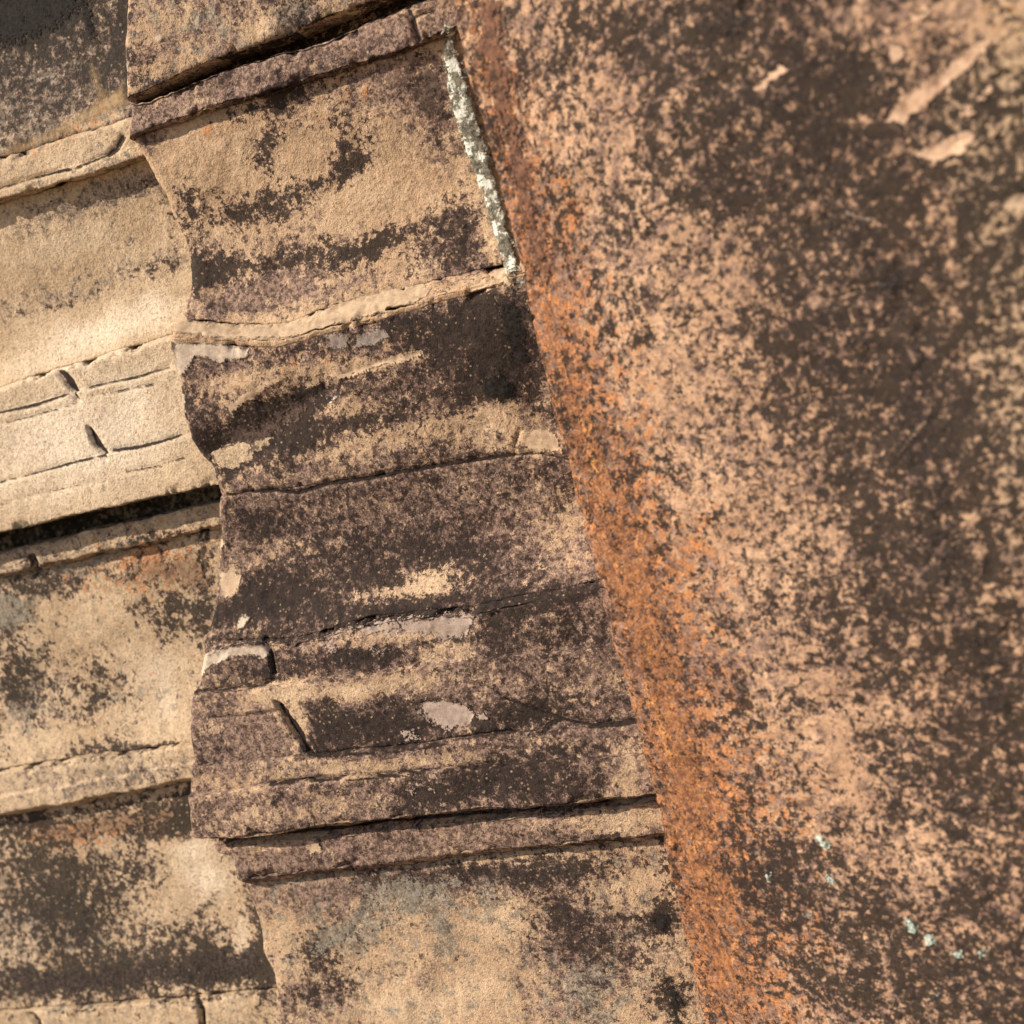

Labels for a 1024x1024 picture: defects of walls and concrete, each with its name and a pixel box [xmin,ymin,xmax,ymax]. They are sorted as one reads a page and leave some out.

damp [189,289,258,316]
spalling [170,284,430,398]
damp [495,282,533,366]
crack [0,367,170,422]
damp [476,369,520,410]
crack [1,434,184,504]
corrosion [456,0,764,1024]
spalling [202,642,271,675]
spalling [320,610,473,655]
crack [193,637,637,786]
spalling [417,697,489,737]